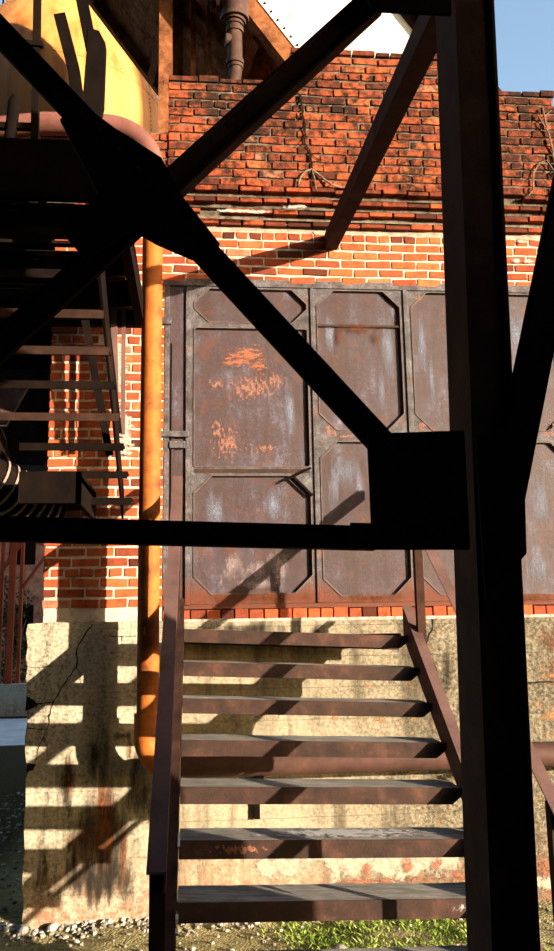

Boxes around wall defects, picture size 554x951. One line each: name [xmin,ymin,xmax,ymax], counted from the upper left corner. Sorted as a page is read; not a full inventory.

crack [27,624,136,764]
water stain [61,762,71,805]
water stain [71,758,150,900]
rust [206,844,267,855]